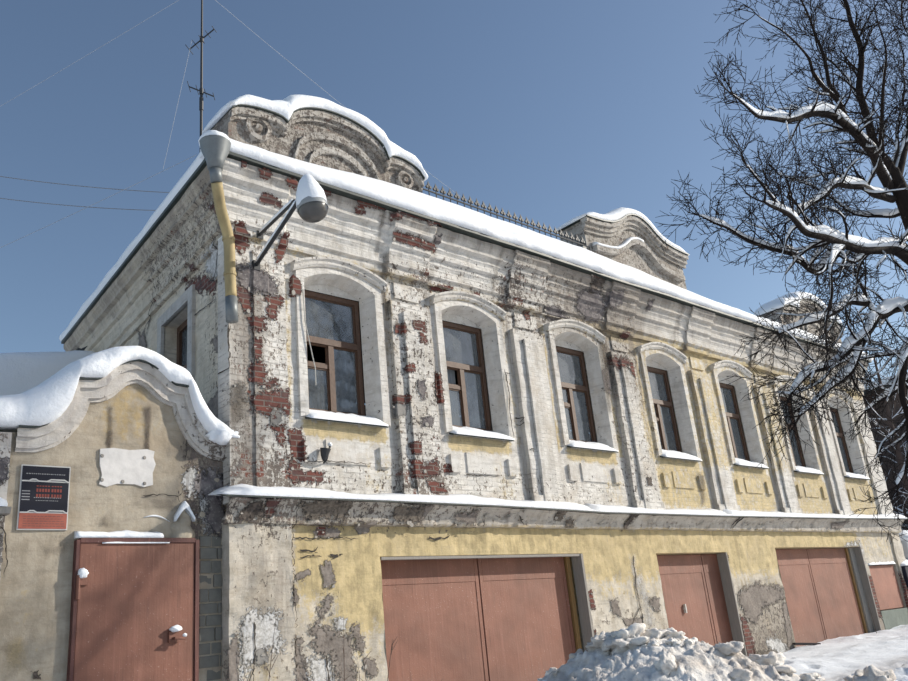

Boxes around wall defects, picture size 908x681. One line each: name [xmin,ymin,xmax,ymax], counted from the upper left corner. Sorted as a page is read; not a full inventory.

flaking render [354,200,444,255]
flaking render [233,220,326,486]
flaking render [392,362,445,408]
flaking render [420,415,434,428]
flaking render [0,456,13,485]
flaking render [408,439,453,494]
flaking render [392,503,435,527]
flaking render [222,560,379,681]
flaking render [736,581,795,656]